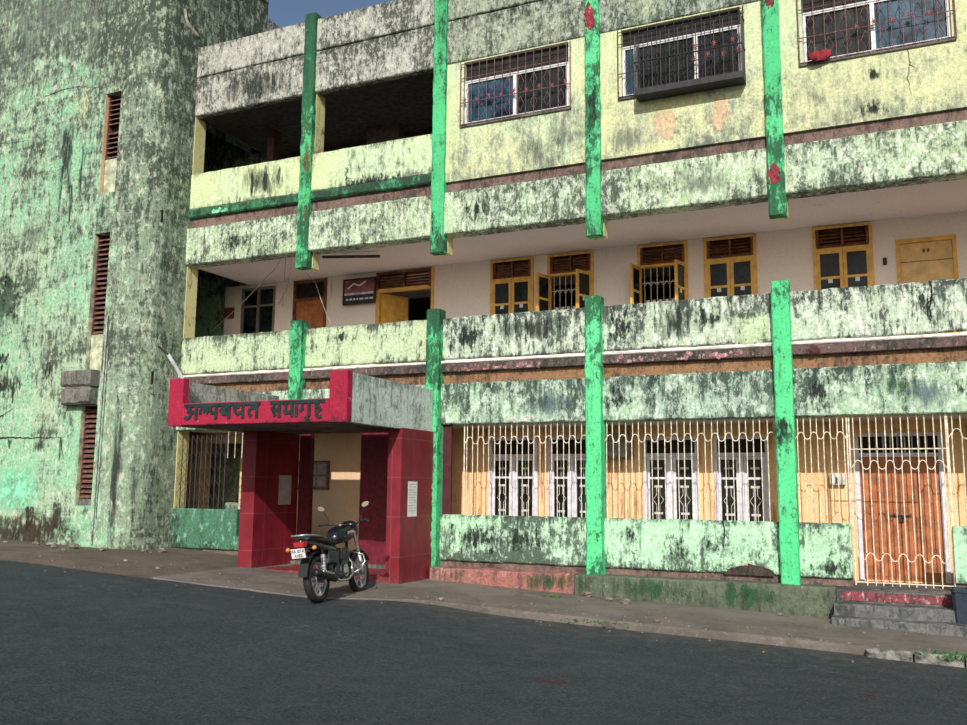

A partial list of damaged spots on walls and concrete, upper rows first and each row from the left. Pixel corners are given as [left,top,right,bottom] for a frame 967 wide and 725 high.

leakage [227,71,284,102]
spalling [653,106,678,141]
spalling [709,94,732,131]
leakage [861,100,887,116]
leakage [58,126,84,223]
leakage [247,166,283,196]
leakage [223,232,251,252]
leakage [0,353,21,404]
leakage [797,380,832,412]
leakage [0,504,78,545]